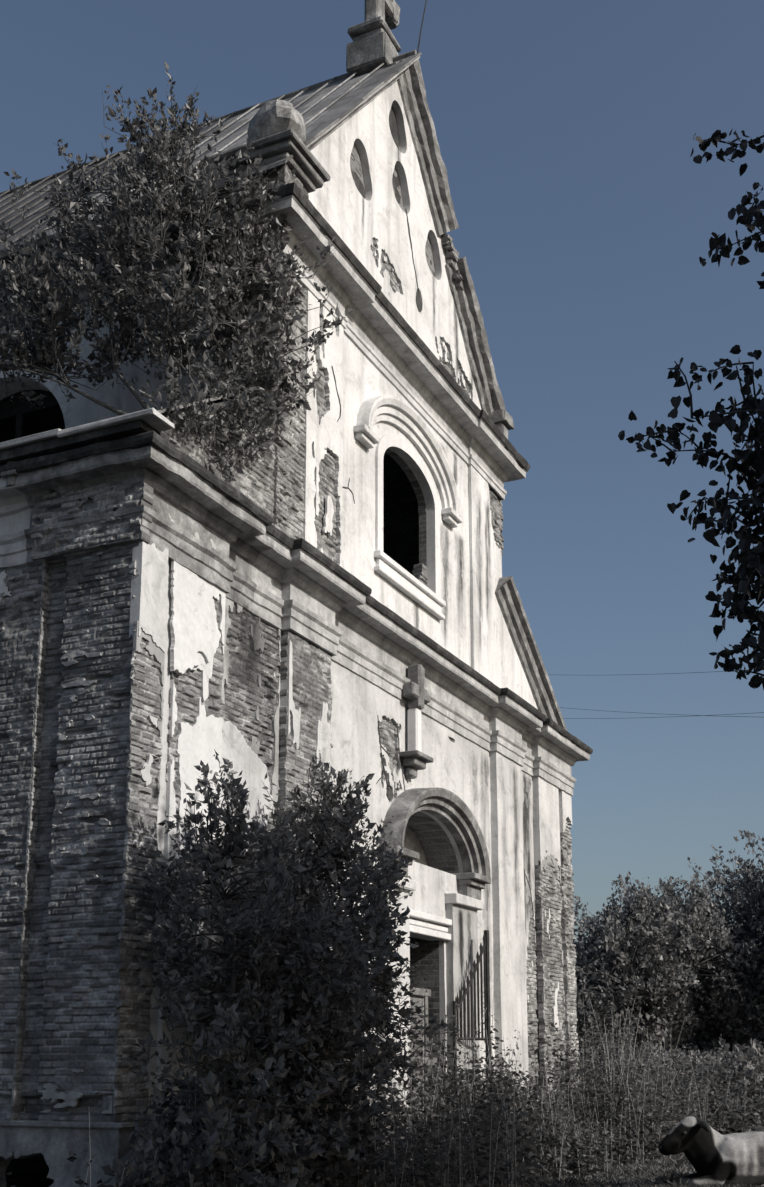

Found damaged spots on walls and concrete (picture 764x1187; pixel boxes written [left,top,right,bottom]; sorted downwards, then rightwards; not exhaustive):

flaking render [265,265,337,563]
flaking render [0,556,11,601]
flaking render [112,561,333,1124]
flaking render [377,716,400,800]
flaking render [526,821,580,1097]